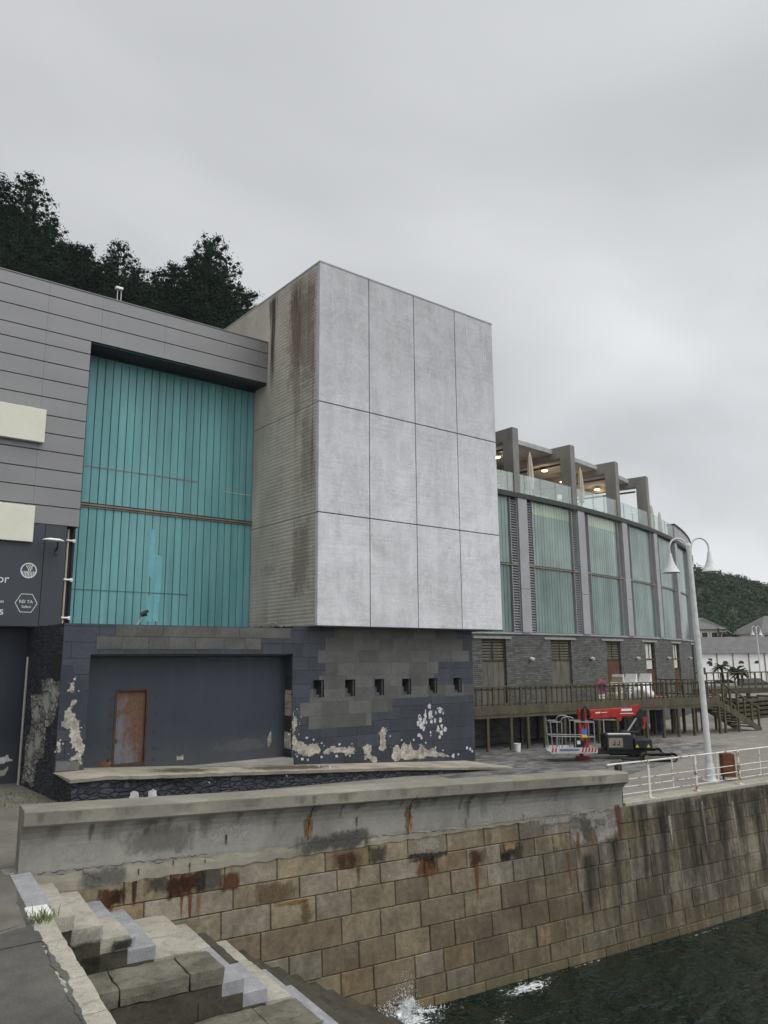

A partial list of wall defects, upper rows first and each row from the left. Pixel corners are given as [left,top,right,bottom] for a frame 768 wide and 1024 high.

peeling [54,665,85,772]
peeling [284,655,473,769]
peeling [129,789,157,798]
damp [83,867,125,886]
rust [97,869,139,912]
damp [148,876,168,892]
rust [167,859,240,916]
damp [298,829,386,864]
rust [335,851,361,877]
rust [471,850,484,893]
damp [686,793,761,860]